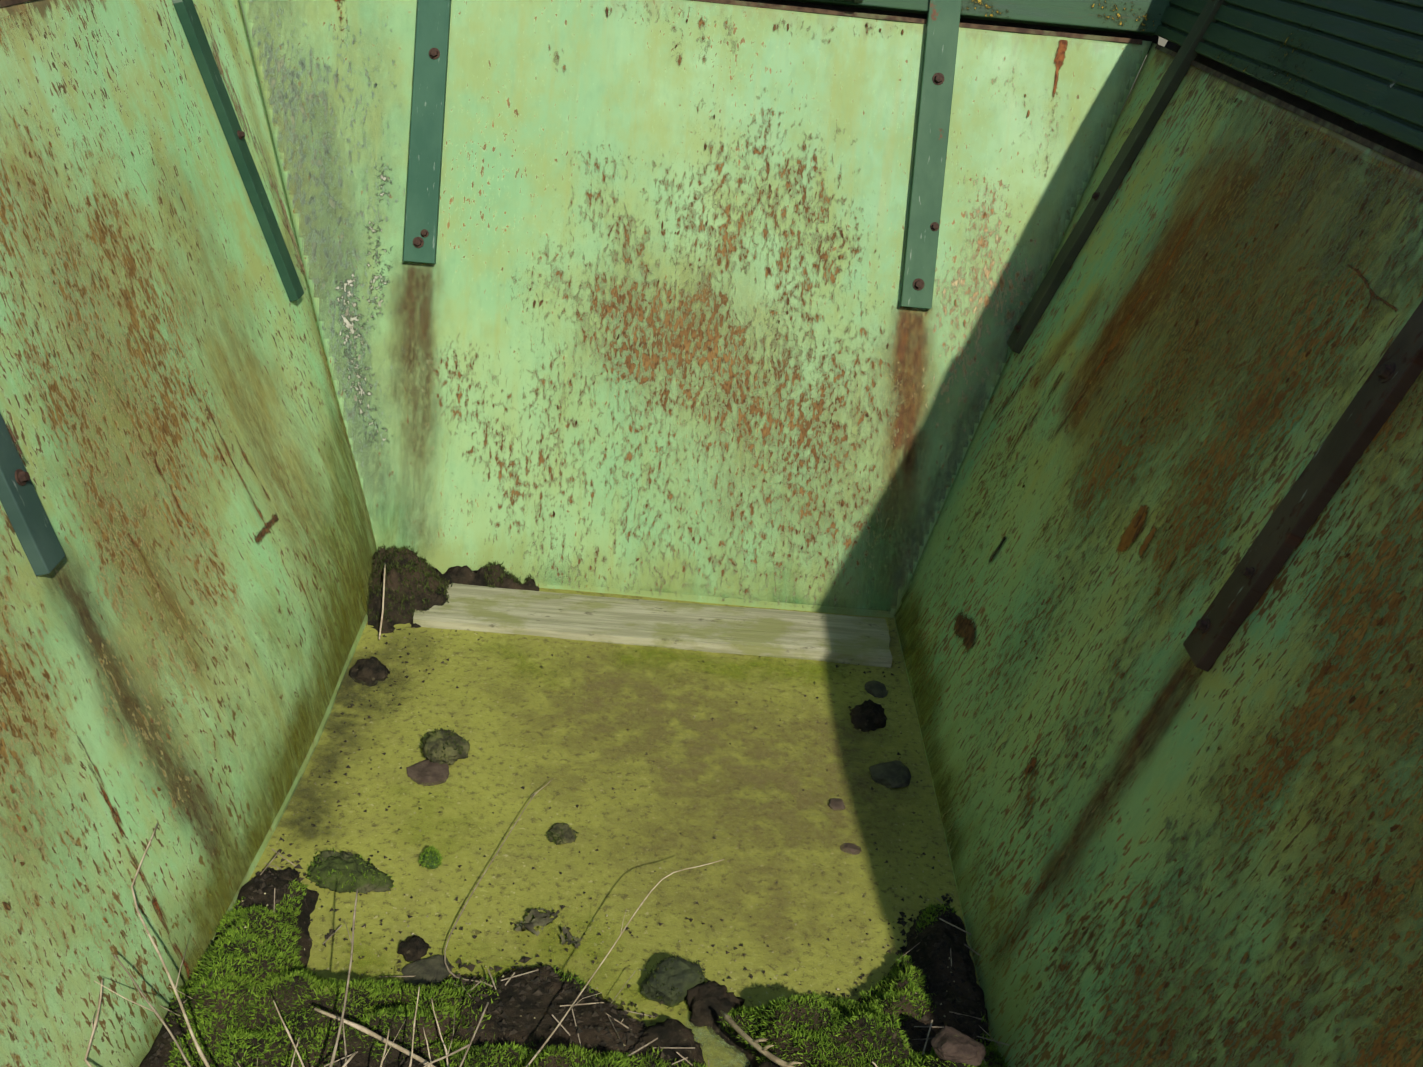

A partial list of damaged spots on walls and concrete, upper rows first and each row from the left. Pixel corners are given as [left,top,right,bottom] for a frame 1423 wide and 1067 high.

corrosion [205,19,306,275]
corrosion [1053,40,1068,97]
corrosion [188,379,271,523]
leakage [400,263,431,457]
corrosion [1116,505,1156,557]
corrosion [77,736,190,978]